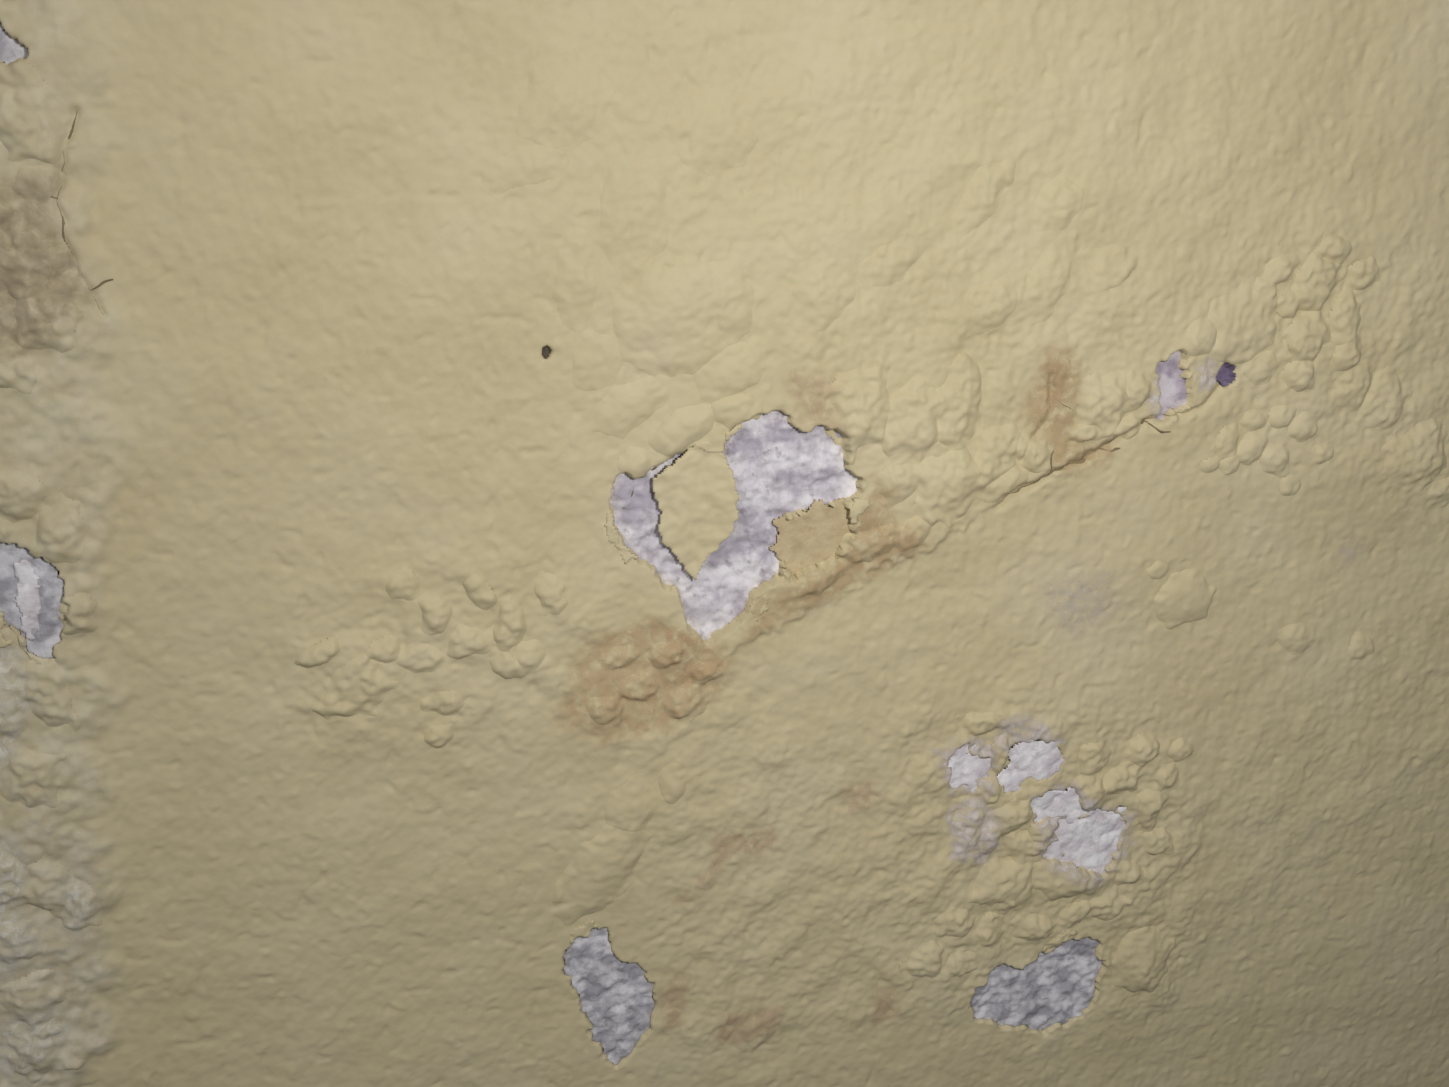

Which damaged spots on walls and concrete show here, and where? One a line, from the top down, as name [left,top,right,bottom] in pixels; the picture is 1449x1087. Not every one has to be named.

peeling [0,22,29,64]
crack [999,383,1217,504]
peeling [1156,351,1187,420]
peeling [605,410,871,641]
peeling [0,542,65,658]
peeling [947,739,1126,875]
peeling [563,920,655,1065]
peeling [971,930,1102,1031]